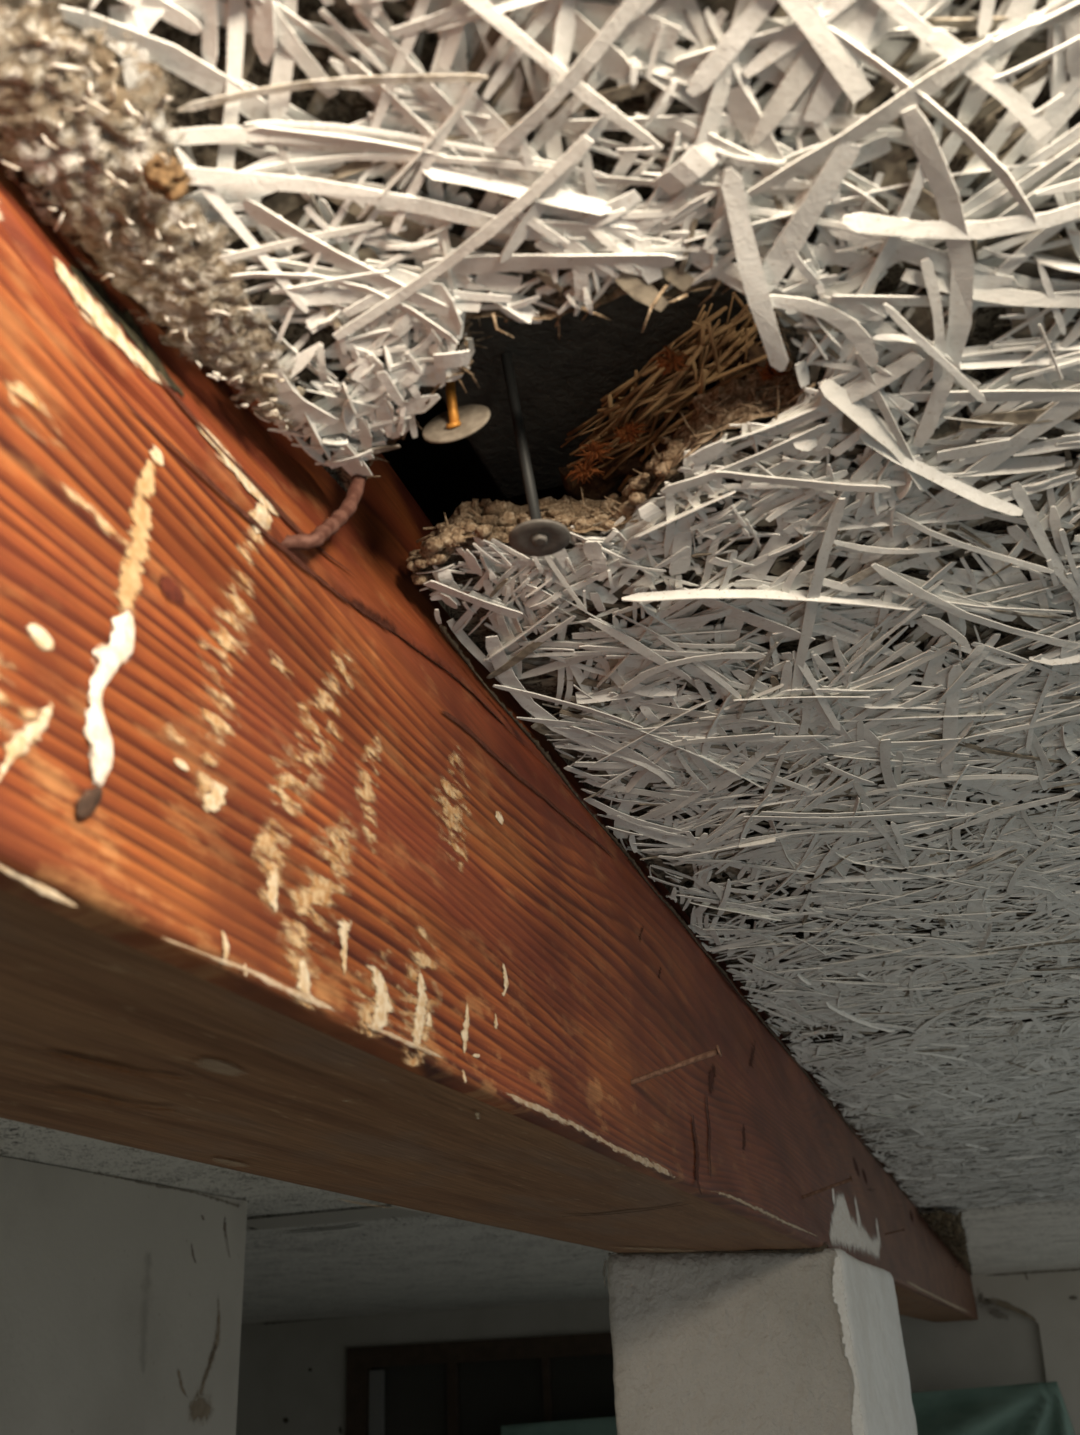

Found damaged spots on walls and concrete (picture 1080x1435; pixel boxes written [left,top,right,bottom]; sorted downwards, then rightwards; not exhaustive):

spalling [463,286,628,350]
spalling [650,279,727,298]
spalling [505,314,811,533]
spalling [421,498,509,553]
peeling [164,937,332,1010]